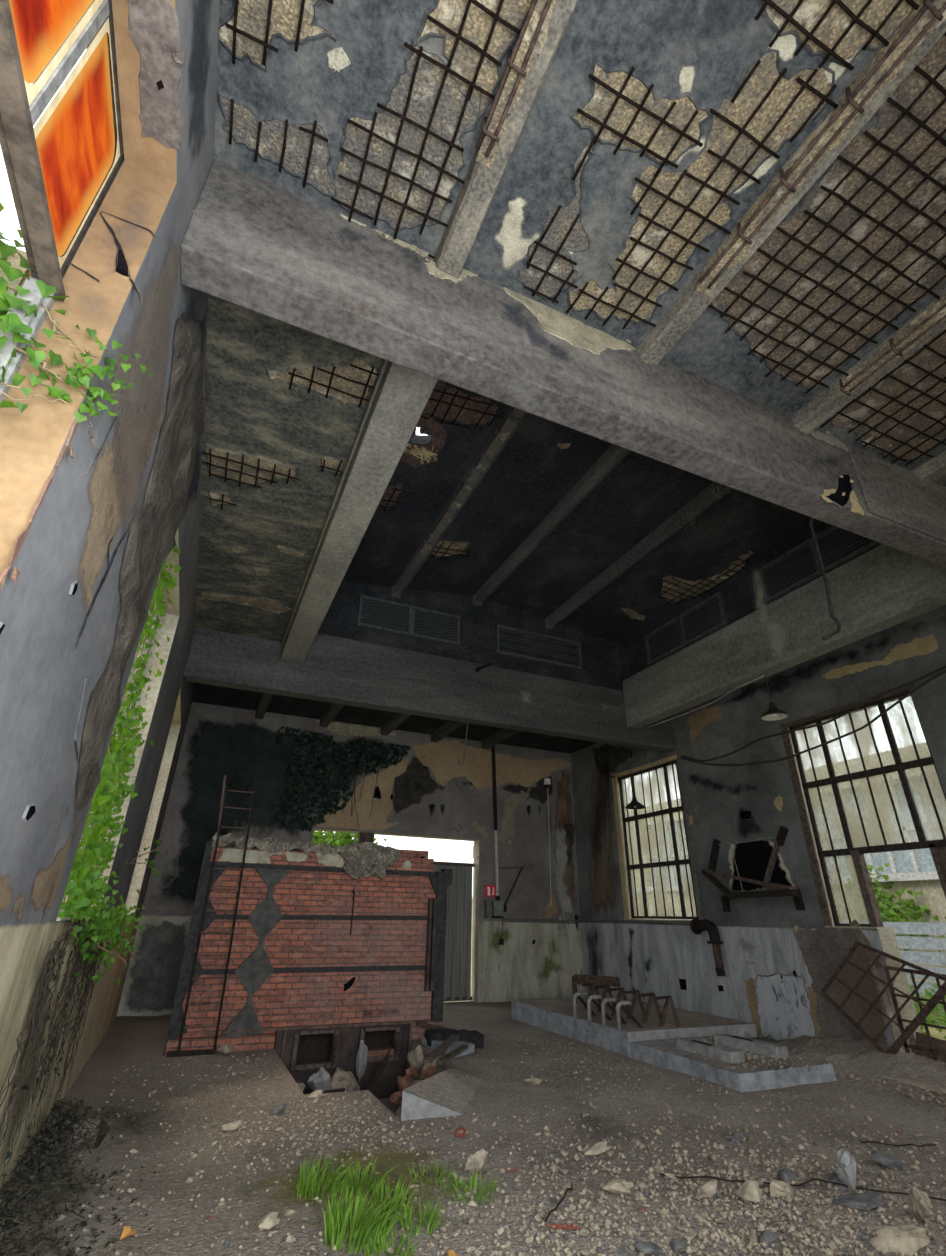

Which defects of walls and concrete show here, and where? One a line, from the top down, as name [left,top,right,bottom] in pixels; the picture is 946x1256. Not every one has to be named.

spalling [217,0,552,283]
crack [70,211,155,303]
spalling [503,0,946,466]
spalling [659,549,755,604]
flaking render [822,635,938,679]
flaking render [315,720,397,737]
flaking render [316,740,571,831]
spalling [728,837,795,892]
flaking render [744,925,887,1044]